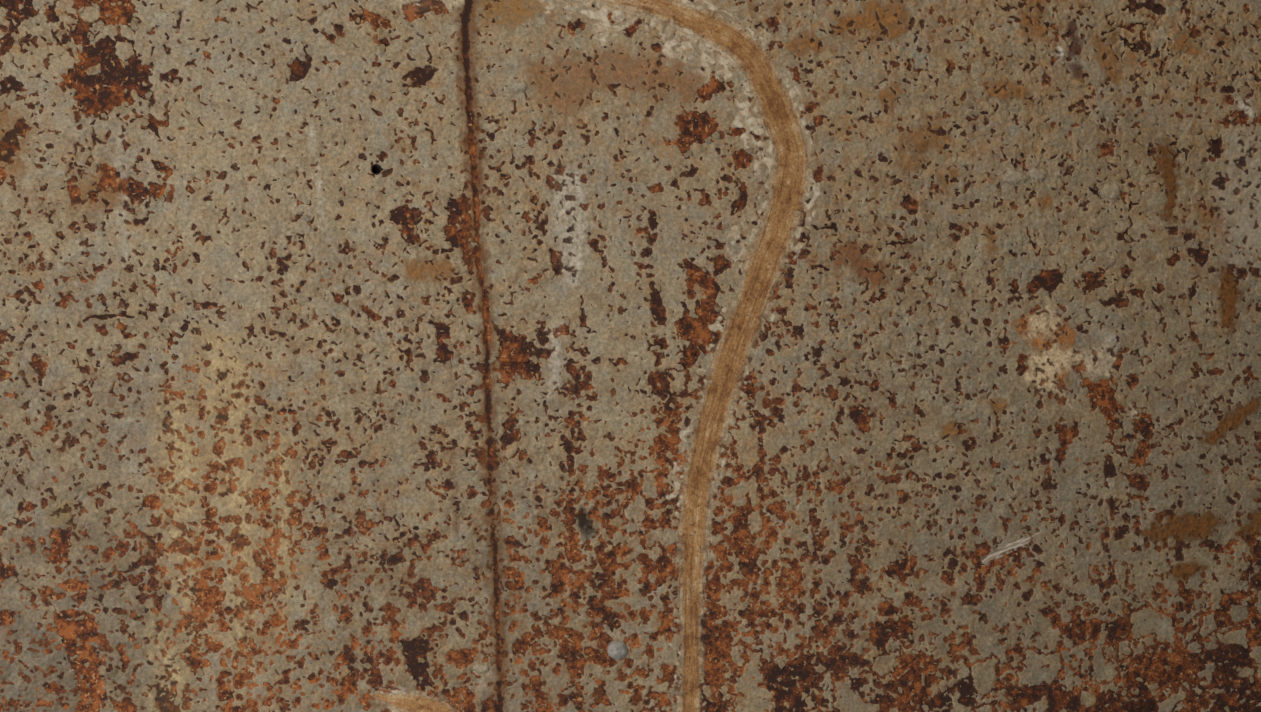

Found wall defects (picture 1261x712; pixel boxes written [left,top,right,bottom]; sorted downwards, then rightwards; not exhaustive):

corrosion [0,0,211,132]
corrosion [0,119,31,185]
corrosion [67,160,172,210]
crack [458,0,506,712]
corrosion [157,390,197,538]
corrosion [202,338,255,636]
corrosion [48,523,111,712]
corrosion [149,629,210,712]
corrosion [758,649,829,712]
corrosion [869,554,943,712]
corrosion [968,541,1018,590]
corrosion [1002,535,1261,712]